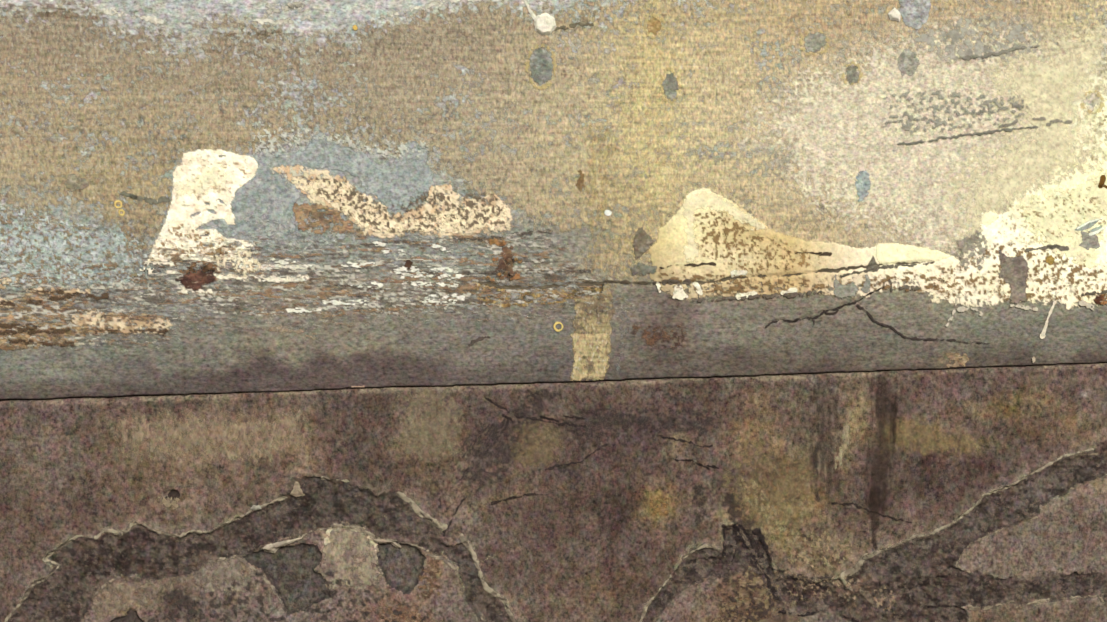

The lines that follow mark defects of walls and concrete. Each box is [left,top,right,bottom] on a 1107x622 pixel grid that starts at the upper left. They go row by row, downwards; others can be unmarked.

damp [114,191,137,216]
rust [175,261,221,290]
peeling [0,127,513,351]
damp [0,230,629,381]
peeling [631,187,1029,303]
crack [765,280,989,344]
peeling [1075,218,1104,250]
flaking render [5,476,518,622]
flaking render [637,440,1107,622]
damp [869,384,976,548]